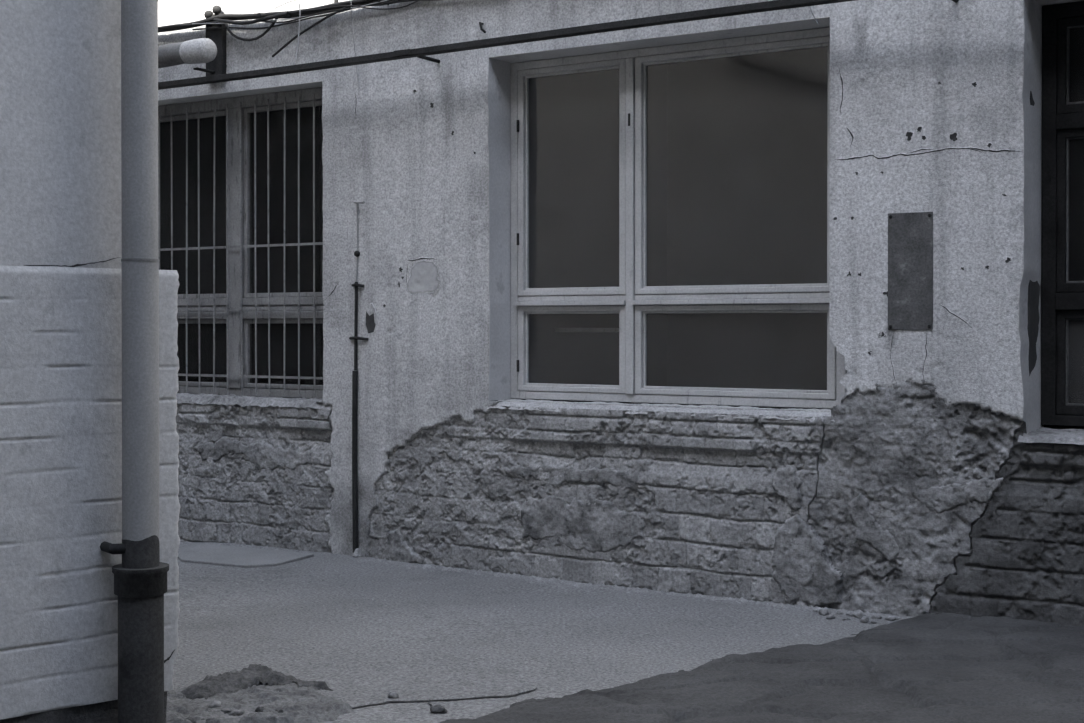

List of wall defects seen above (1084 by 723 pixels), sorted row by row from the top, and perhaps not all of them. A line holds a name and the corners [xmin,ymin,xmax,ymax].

crack [835,68,1022,160]
spalling [176,401,334,553]
spalling [368,377,1084,626]